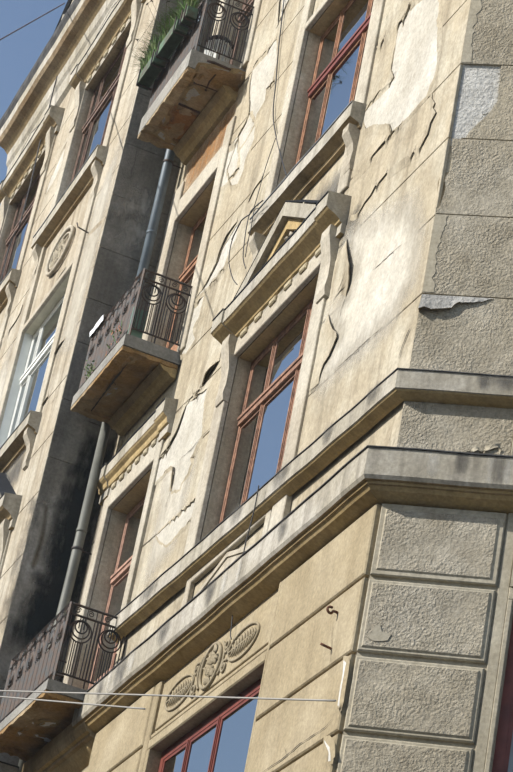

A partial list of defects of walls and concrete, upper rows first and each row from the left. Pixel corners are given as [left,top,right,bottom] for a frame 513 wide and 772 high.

flaking render [178,36,279,191]
crack [349,0,436,223]
flaking render [363,0,443,139]
damp [12,436,114,645]